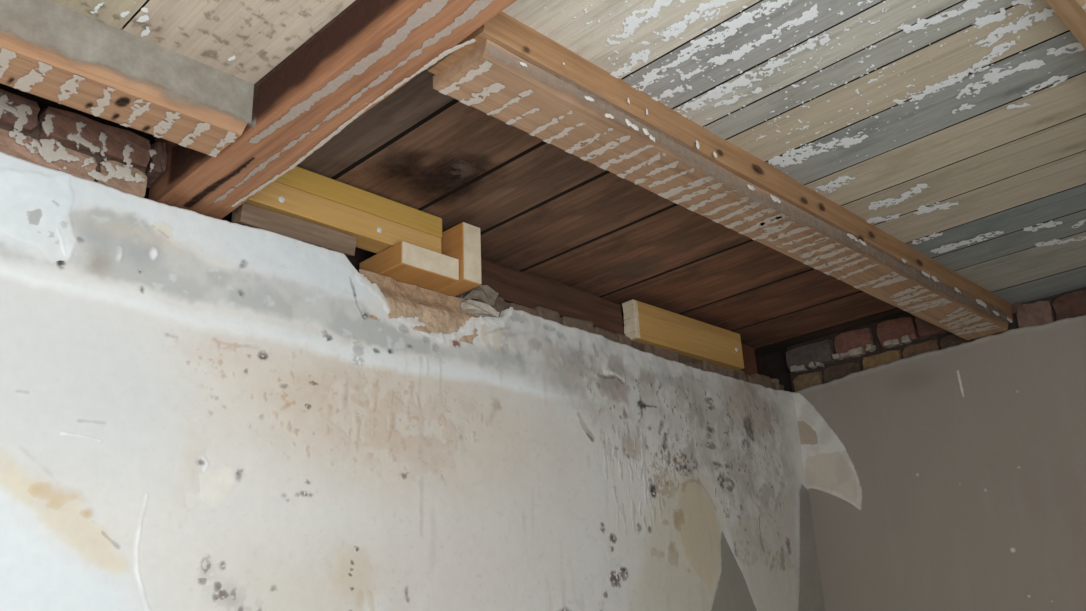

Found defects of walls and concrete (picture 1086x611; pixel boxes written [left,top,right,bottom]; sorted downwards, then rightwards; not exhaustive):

flaking render [0,89,167,265]
water stain [169,144,207,183]
water stain [214,0,494,207]
water stain [320,328,335,343]
water stain [349,323,462,429]
flaking render [355,269,1086,410]
water stain [0,415,133,582]
water stain [535,349,863,611]